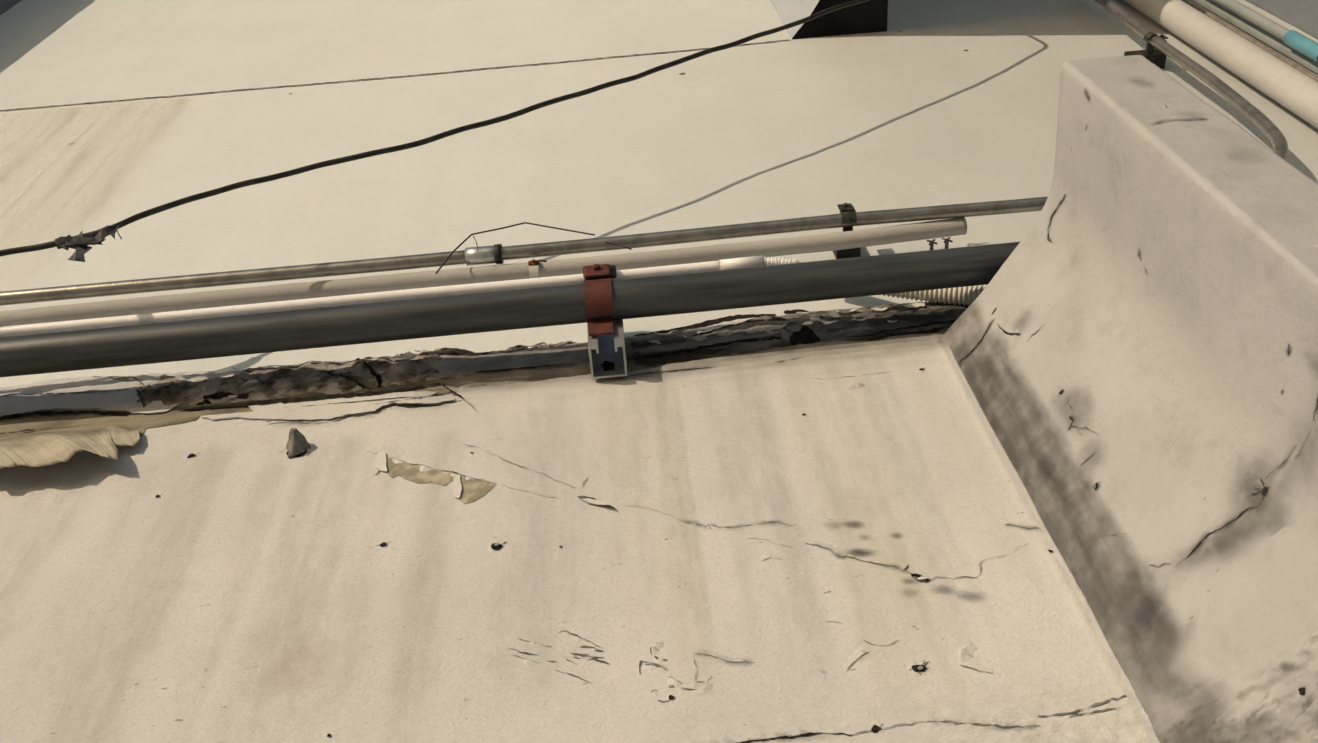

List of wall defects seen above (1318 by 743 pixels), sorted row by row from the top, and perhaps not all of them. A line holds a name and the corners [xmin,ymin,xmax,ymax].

spalling [626,301,968,370]
peeling [0,341,576,469]
crack [266,363,715,422]
peeling [368,450,496,504]
crack [1149,398,1318,567]
crack [618,504,1040,580]
crack [658,694,1126,743]